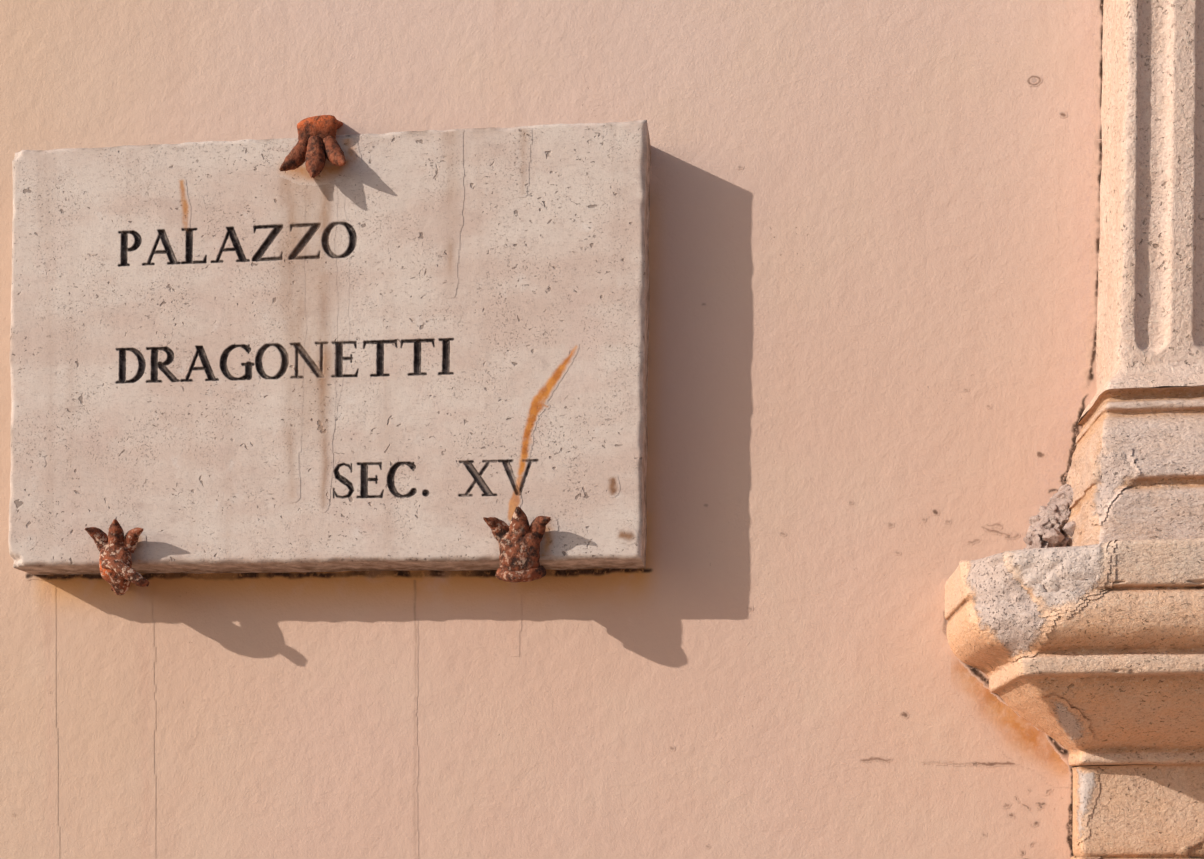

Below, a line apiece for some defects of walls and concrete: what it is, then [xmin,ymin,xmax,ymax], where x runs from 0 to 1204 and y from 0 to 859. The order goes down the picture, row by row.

corrosion [177,178,191,234]
corrosion [274,138,361,186]
crack [1046,0,1104,495]
corrosion [506,343,579,524]
corrosion [539,514,558,557]
spalling [959,446,1140,662]
crack [411,579,419,859]
crack [859,756,1017,768]
crack [941,608,1077,859]